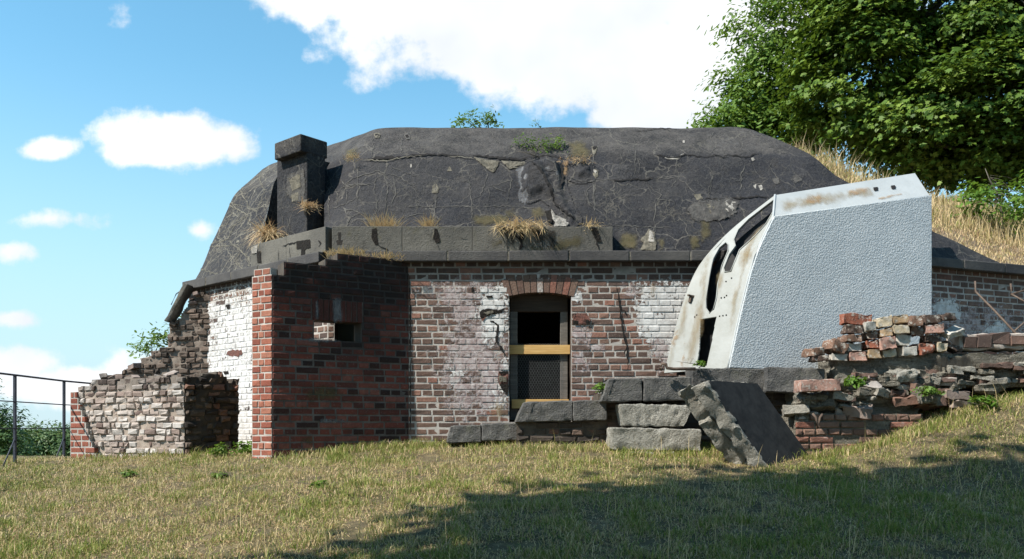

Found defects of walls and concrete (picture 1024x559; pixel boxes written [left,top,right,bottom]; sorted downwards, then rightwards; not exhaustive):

crack [570,128,788,238]
crack [200,131,563,273]
spalling [545,209,569,226]
spalling [283,239,310,255]
crack [490,320,505,357]